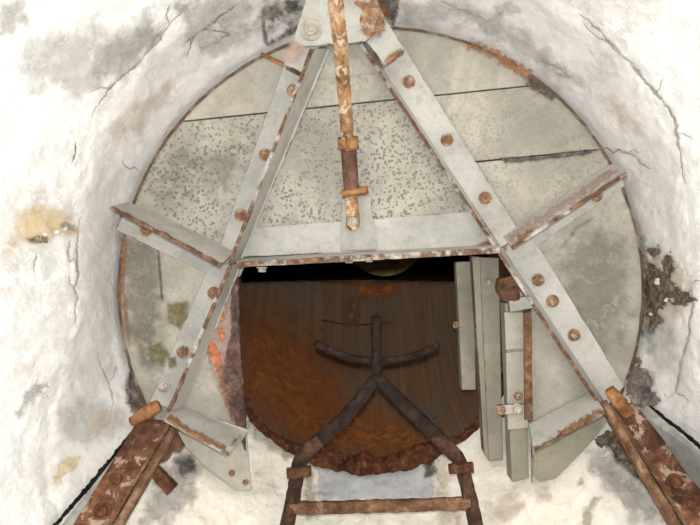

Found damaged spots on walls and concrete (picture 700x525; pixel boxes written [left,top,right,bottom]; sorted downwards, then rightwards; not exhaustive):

crack [89,3,191,115]
crack [184,4,237,59]
corrosion [468,42,549,90]
crack [577,12,691,182]
spalling [29,221,75,243]
crack [67,218,81,328]
spalling [641,239,698,335]
corrosion [245,398,303,455]
corrosion [309,441,442,476]
corrosion [449,416,480,445]